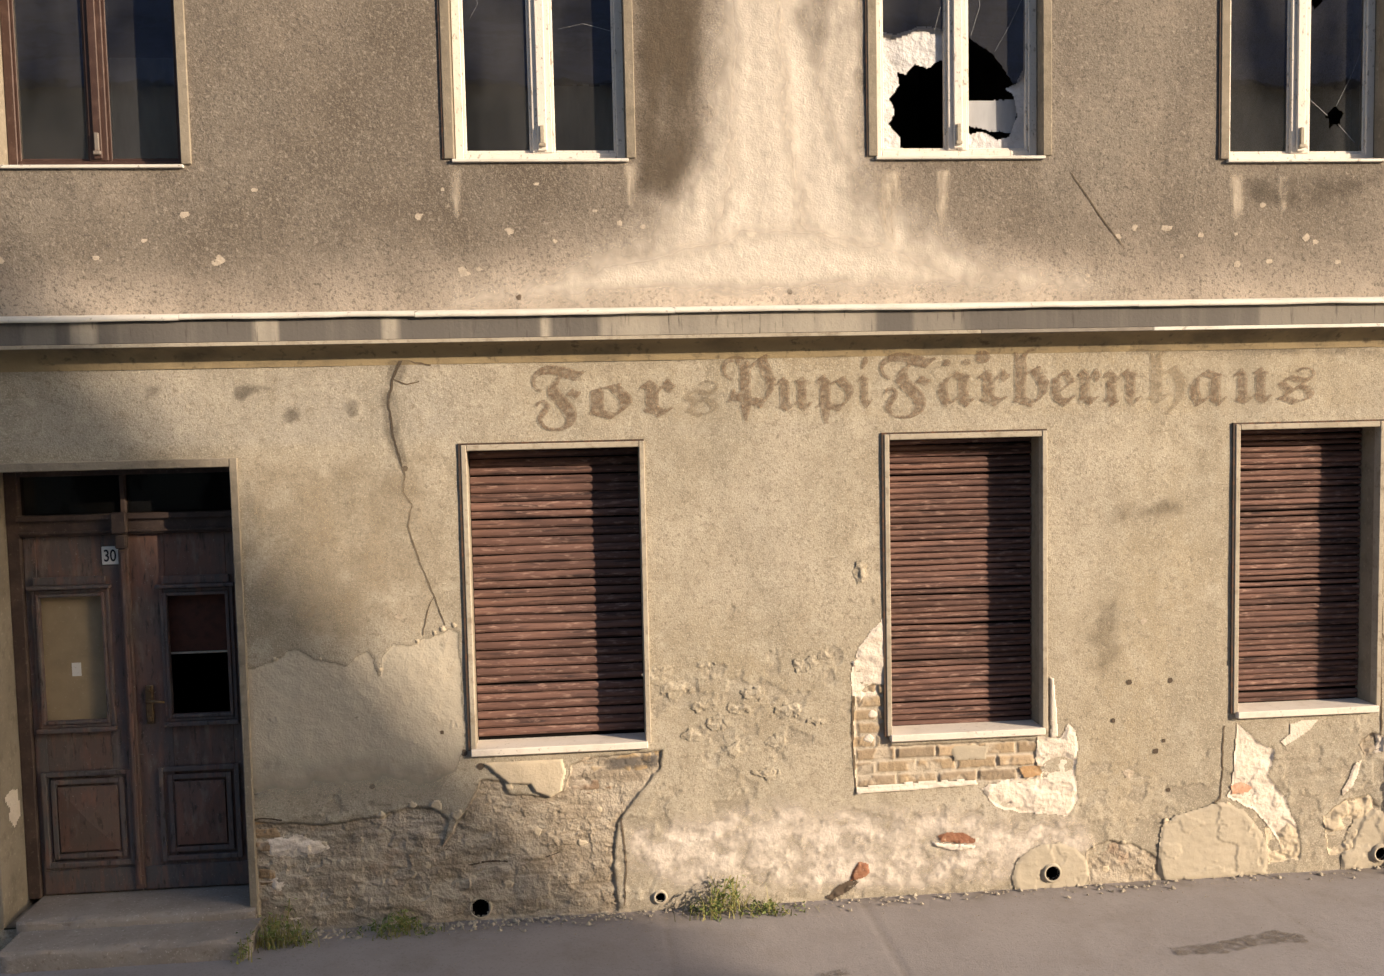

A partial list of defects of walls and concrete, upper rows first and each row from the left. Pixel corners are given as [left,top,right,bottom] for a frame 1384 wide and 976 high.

leakage [527,0,978,297]
crack [387,361,445,635]
flaking render [248,622,662,931]
spalling [653,890,668,904]
flaking render [932,832,975,851]
flaking render [851,618,1078,816]
flaking render [1225,720,1318,864]
spalling [1323,732,1384,855]
spalling [1371,844,1384,862]